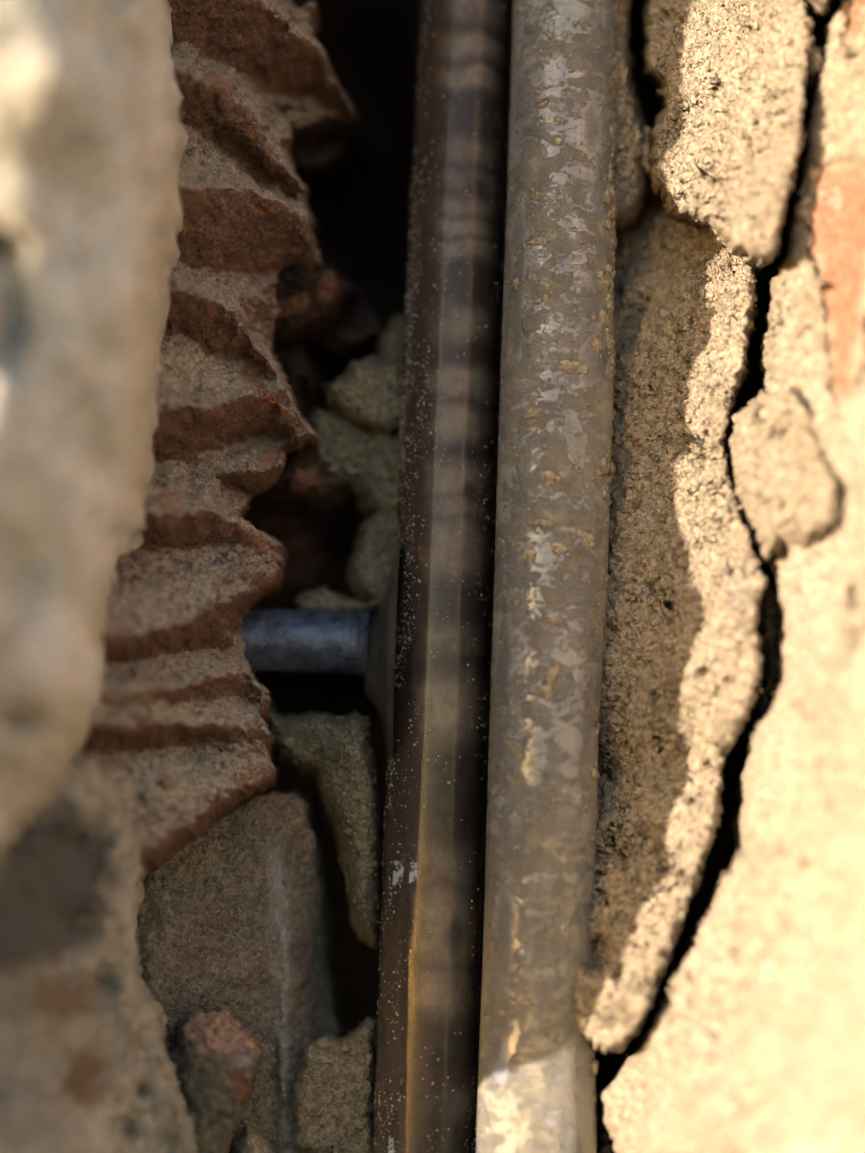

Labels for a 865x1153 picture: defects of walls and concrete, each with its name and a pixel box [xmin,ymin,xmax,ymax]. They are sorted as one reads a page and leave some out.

crack [629,0,663,129]
crack [802,83,813,127]
crack [808,1,840,46]
crack [732,156,800,426]
crack [741,514,774,584]
crack [595,651,764,1153]